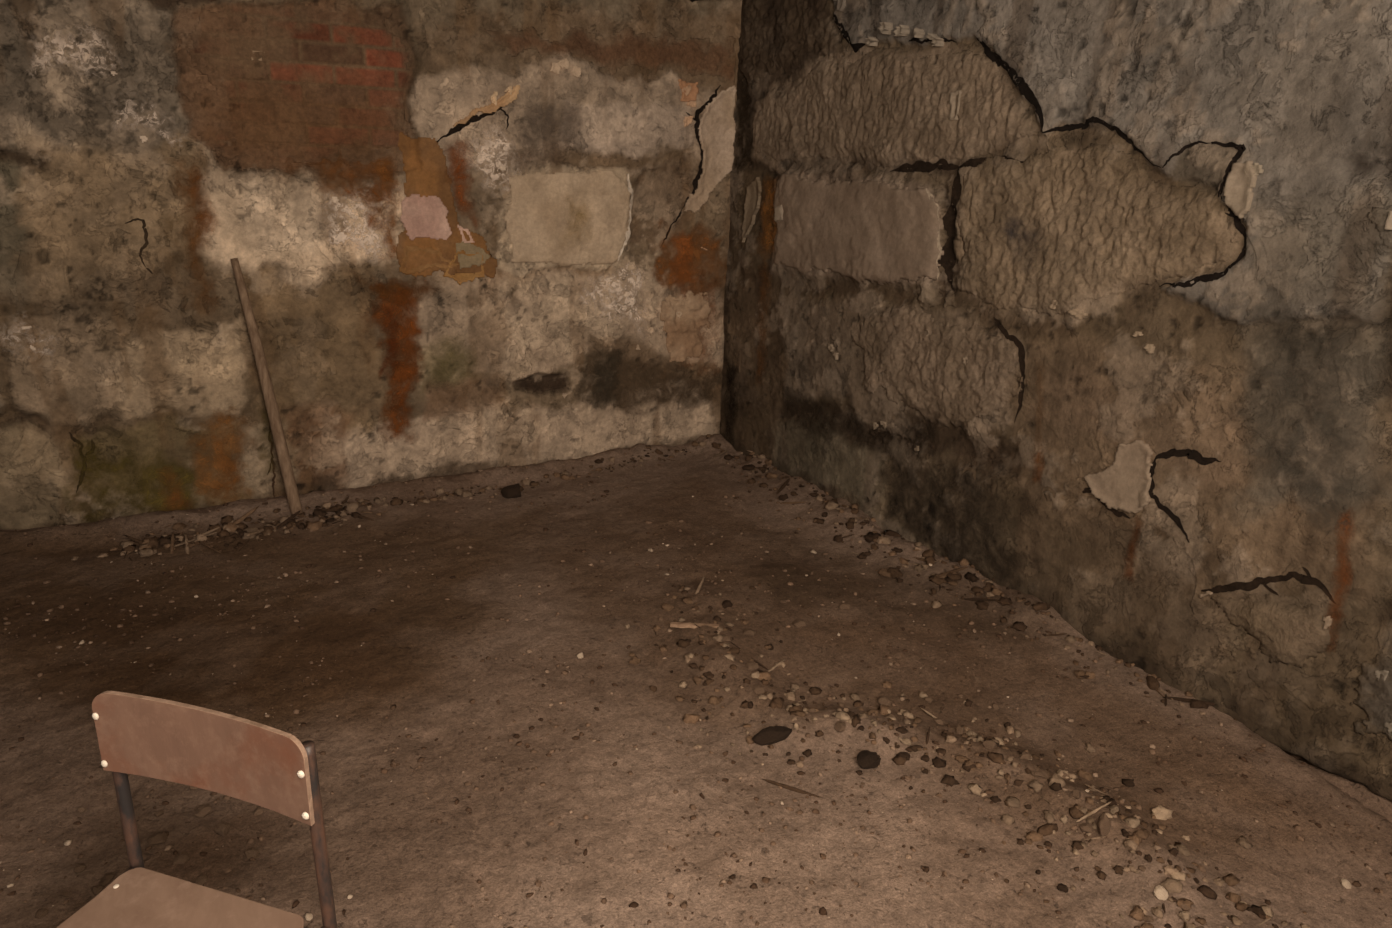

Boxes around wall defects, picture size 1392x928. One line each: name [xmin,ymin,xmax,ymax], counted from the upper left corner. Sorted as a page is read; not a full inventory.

crack [437,107,509,142]
flaking render [453,85,520,126]
crack [660,85,721,248]
flaking render [484,0,1264,319]
peeling [396,132,497,285]
rust [655,227,719,307]
rust [373,280,431,436]
flaking render [1131,331,1155,354]
flaking render [1082,440,1153,519]
crack [1201,567,1336,604]